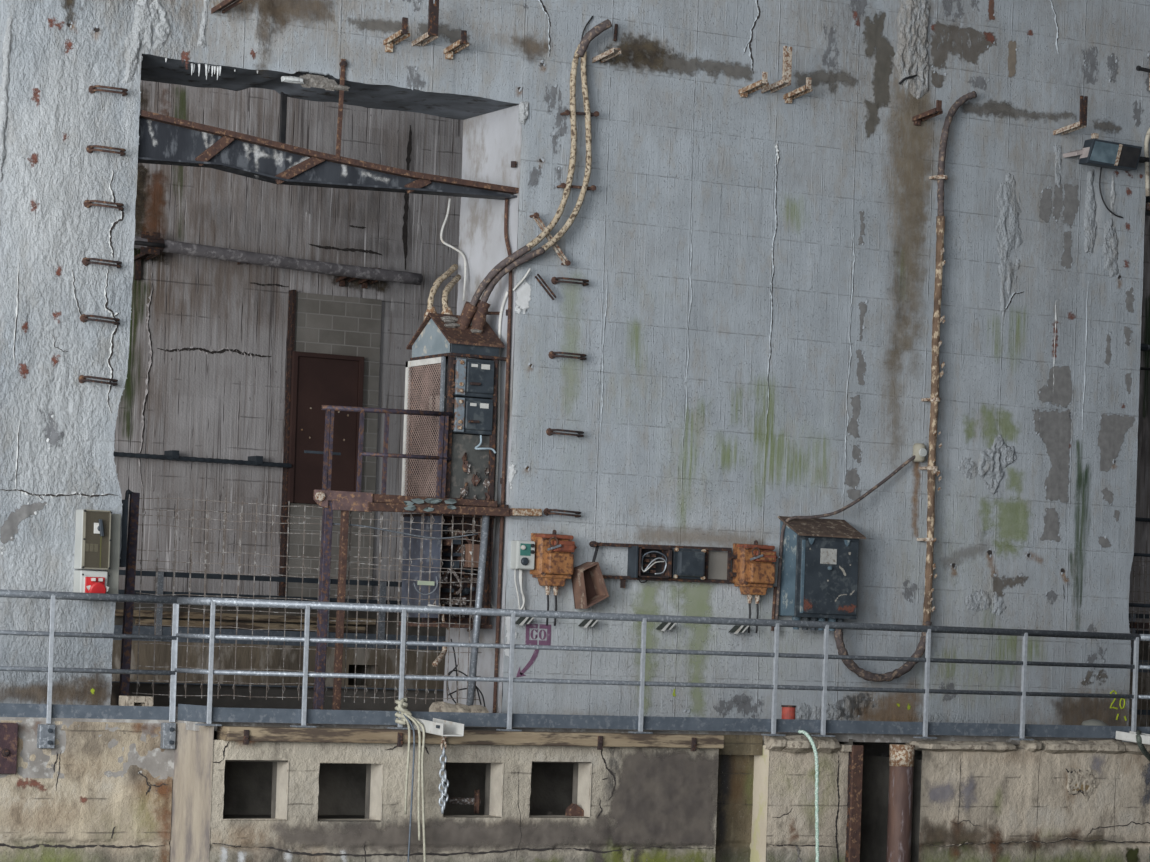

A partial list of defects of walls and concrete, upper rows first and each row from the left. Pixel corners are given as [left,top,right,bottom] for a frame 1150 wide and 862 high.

damp [64,0,74,22]
crack [538,0,551,57]
damp [599,36,753,82]
crack [744,0,760,74]
peeling [931,0,1017,90]
crack [72,170,124,414]
crack [766,141,780,436]
crack [0,264,272,501]
peeling [1032,366,1073,542]
damp [1126,848,1139,862]